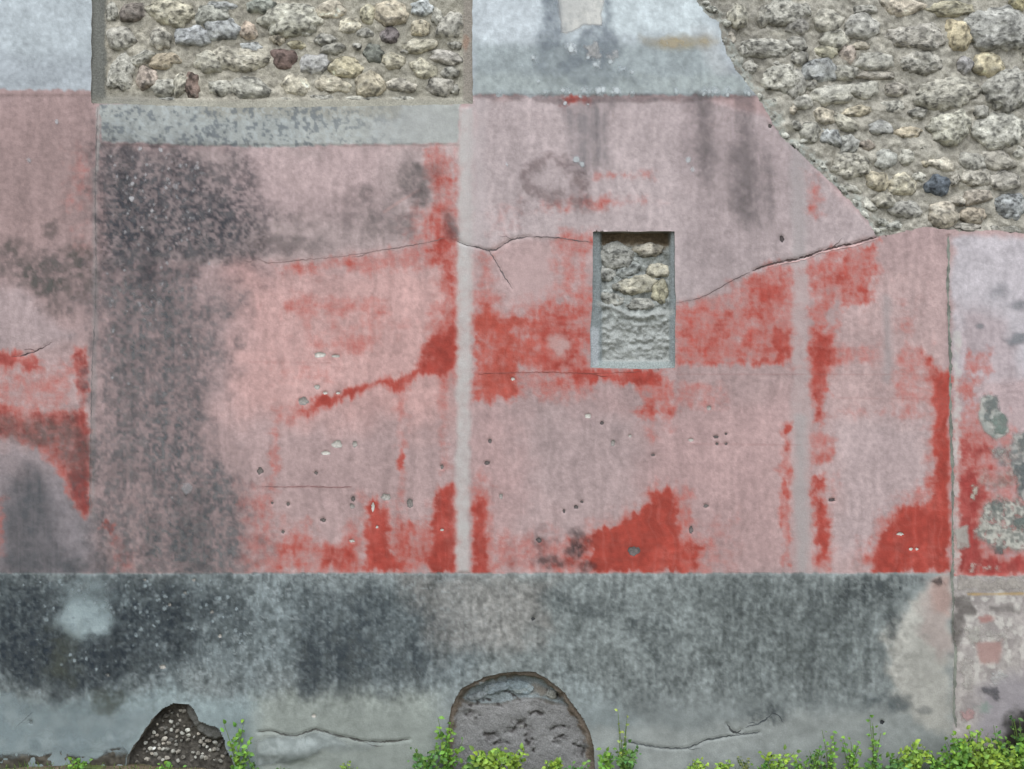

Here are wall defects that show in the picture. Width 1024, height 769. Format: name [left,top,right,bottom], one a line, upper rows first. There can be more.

crack [247,236,588,289]
crack [682,237,876,302]
damp [91,268,240,572]
peeling [954,433,1024,554]
efflorescence [58,593,113,639]
damp [299,586,430,687]
damp [834,578,902,610]
spalling [0,703,234,769]
crack [259,728,409,747]
crack [626,713,783,750]